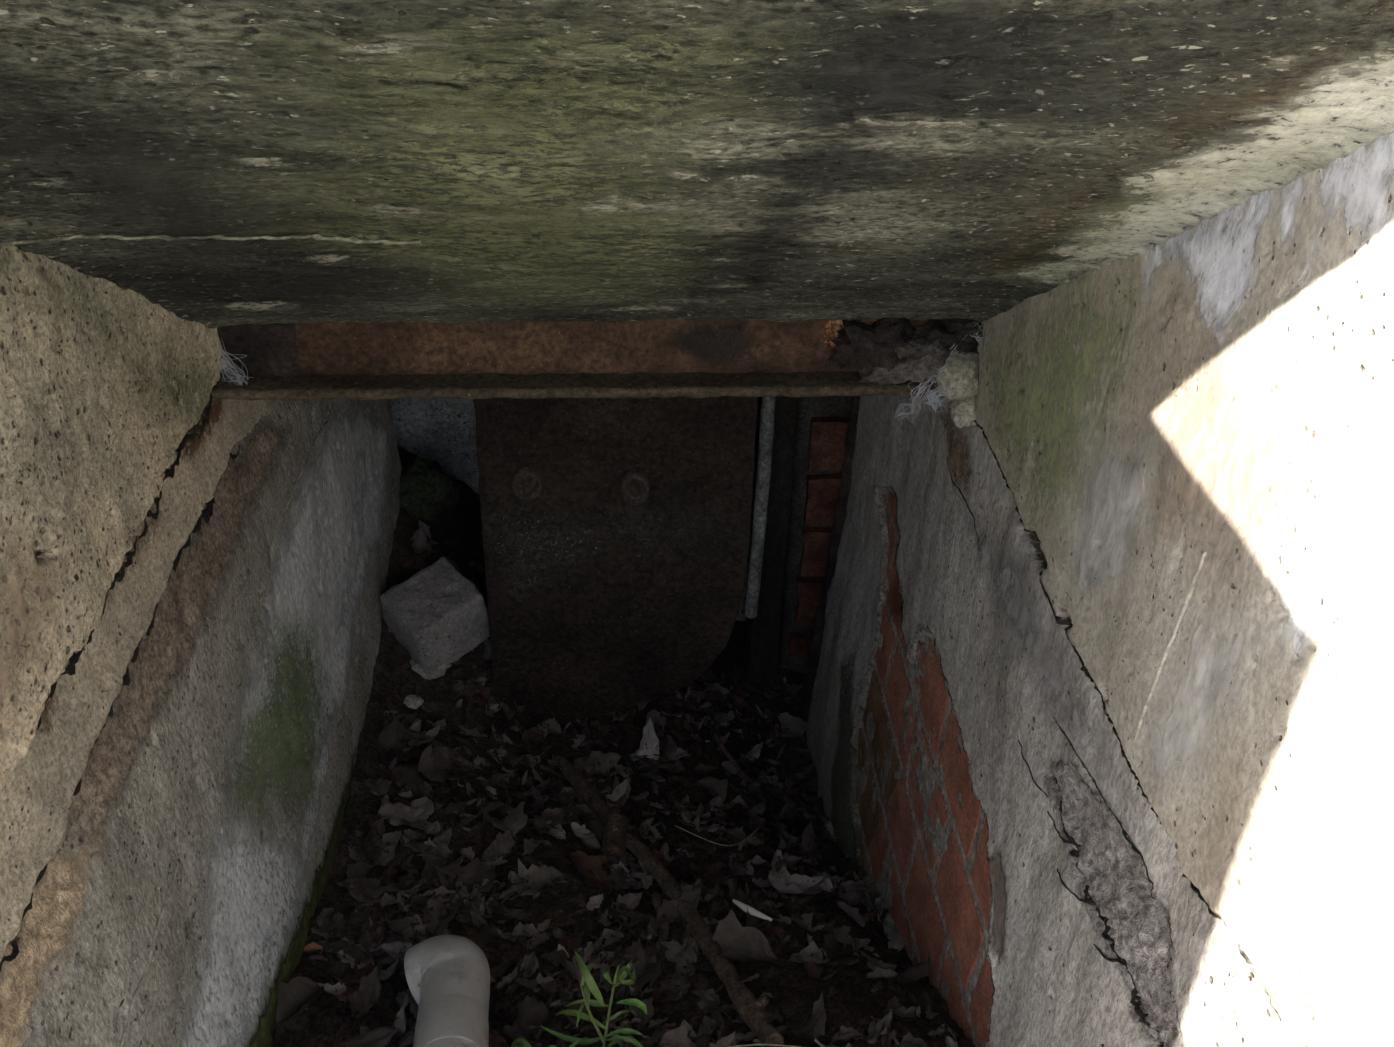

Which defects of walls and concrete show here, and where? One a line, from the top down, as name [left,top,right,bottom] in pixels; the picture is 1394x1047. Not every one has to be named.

leakage [0,80,391,311]
leakage [692,29,998,288]
leakage [1021,55,1394,327]
rust [217,323,300,379]
crack [0,845,62,972]
crack [37,393,212,730]
crack [95,445,240,742]
leakage [183,405,387,1047]
peeling [849,485,995,1047]
crack [1039,572,1161,824]
spalling [1045,760,1183,1047]
crack [1018,722,1282,1047]